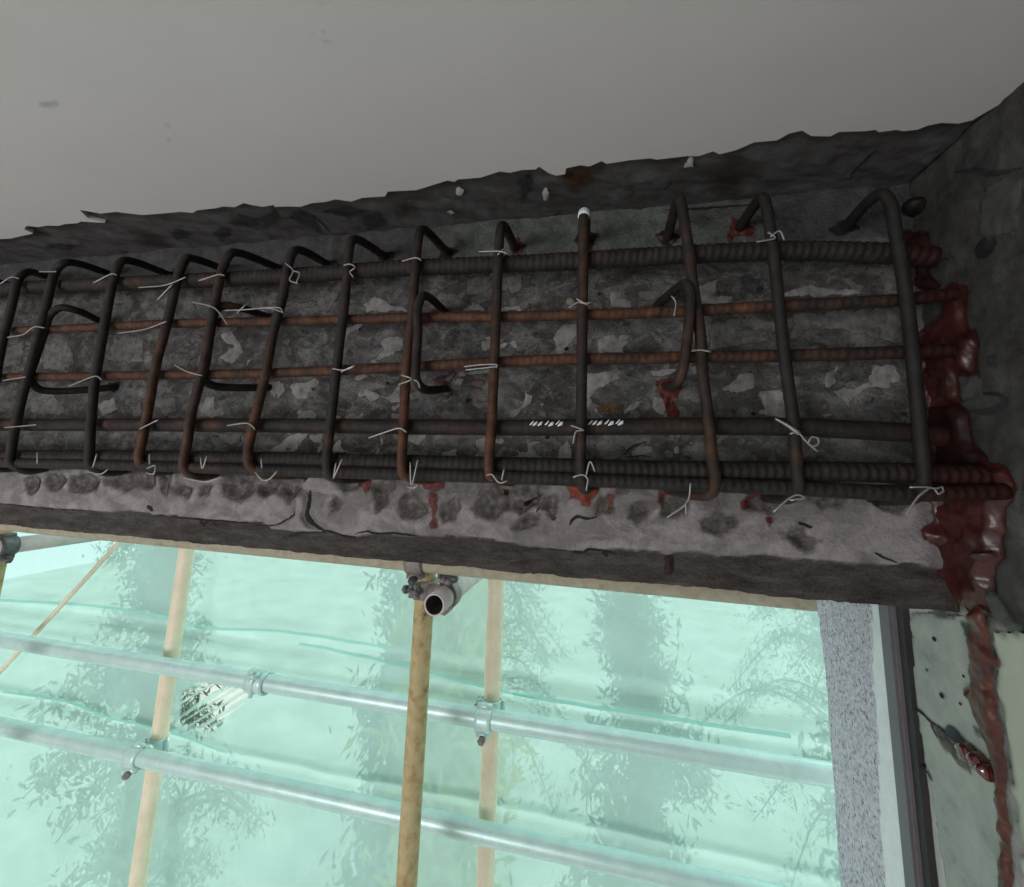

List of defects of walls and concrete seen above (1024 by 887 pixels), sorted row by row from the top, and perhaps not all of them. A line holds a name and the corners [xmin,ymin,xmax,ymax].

peeling [0,116,980,265]
peeling [549,323,577,354]
peeling [269,381,285,398]
peeling [336,382,400,419]
peeling [623,396,667,415]
peeling [751,390,786,418]
crack [147,490,416,538]
spalling [24,473,558,531]
spalling [627,491,689,524]
spalling [700,512,737,535]
crack [548,548,617,557]
spalling [786,527,816,552]